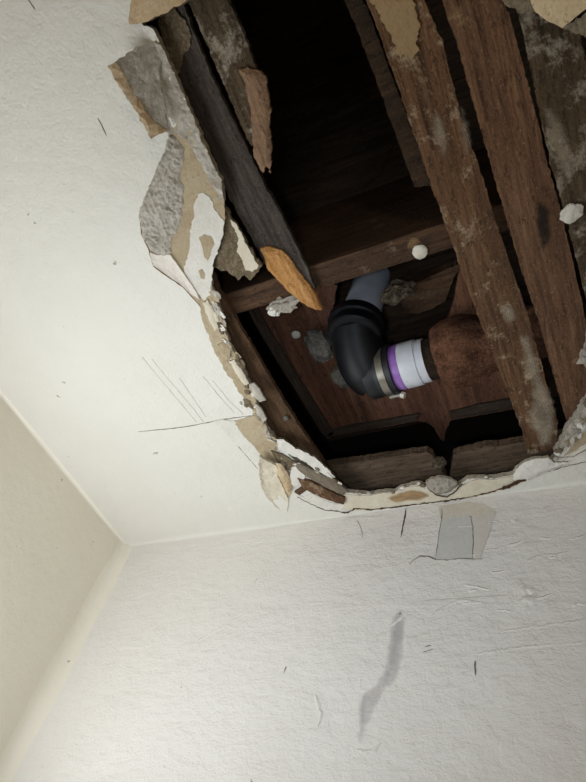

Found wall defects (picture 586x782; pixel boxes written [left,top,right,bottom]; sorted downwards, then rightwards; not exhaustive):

crack [141,415,254,432]
peeling [108,41,586,560]